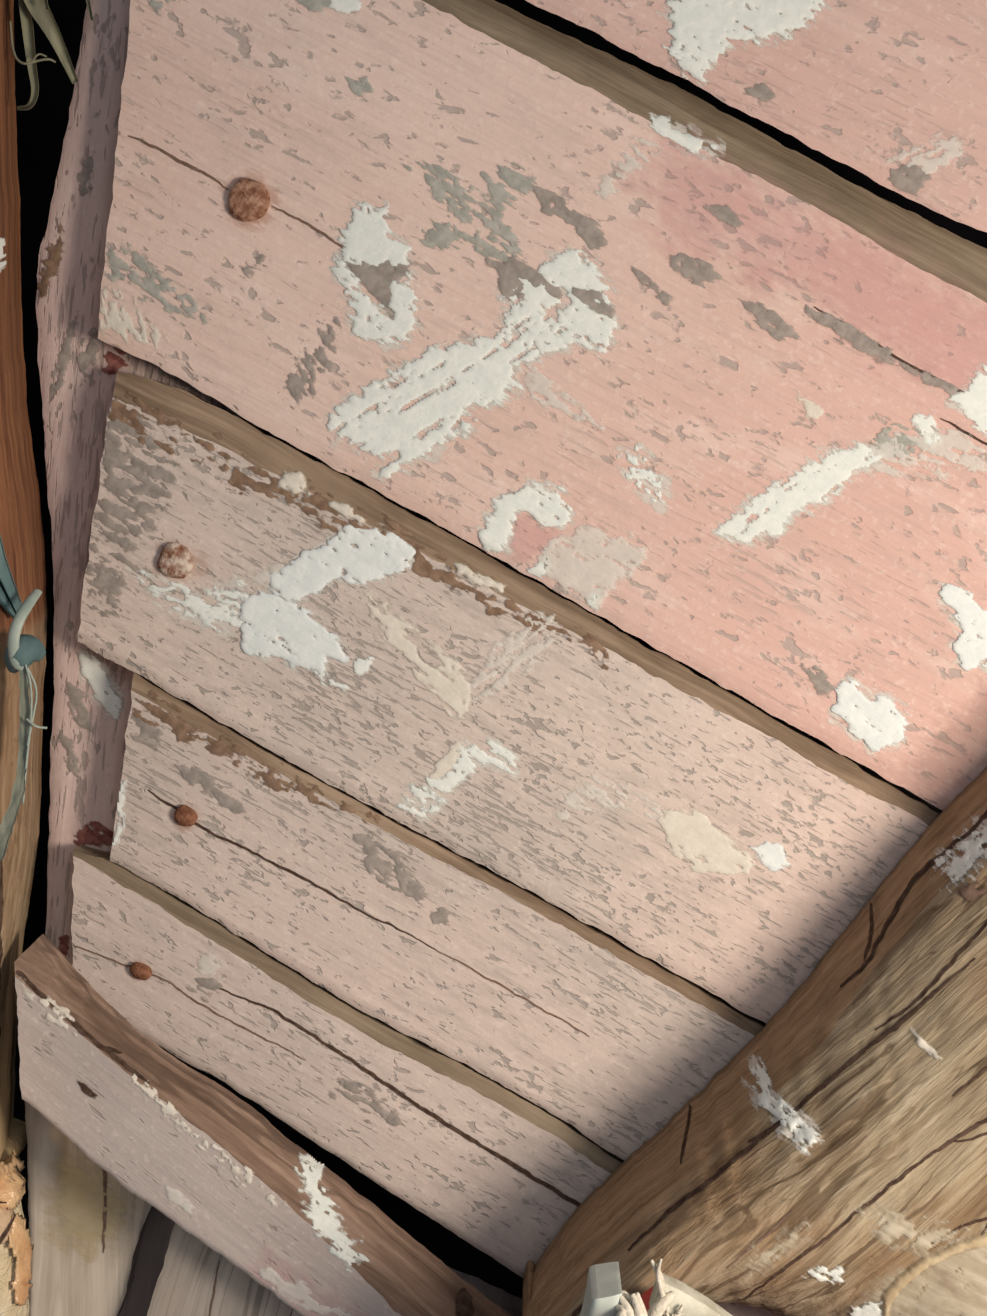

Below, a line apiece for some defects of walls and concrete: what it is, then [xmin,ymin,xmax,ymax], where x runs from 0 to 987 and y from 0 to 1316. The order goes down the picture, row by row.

crack [128,135,230,190]
crack [271,206,345,248]
peeling [345,259,409,320]
peeling [403,160,615,318]
peeling [871,424,921,457]
peeling [84,391,609,670]
crack [148,790,590,1037]
crack [74,945,581,1207]
crack [627,920,987,1251]
crack [572,1304,583,1316]
crack [726,1210,793,1269]
crack [744,1118,987,1300]